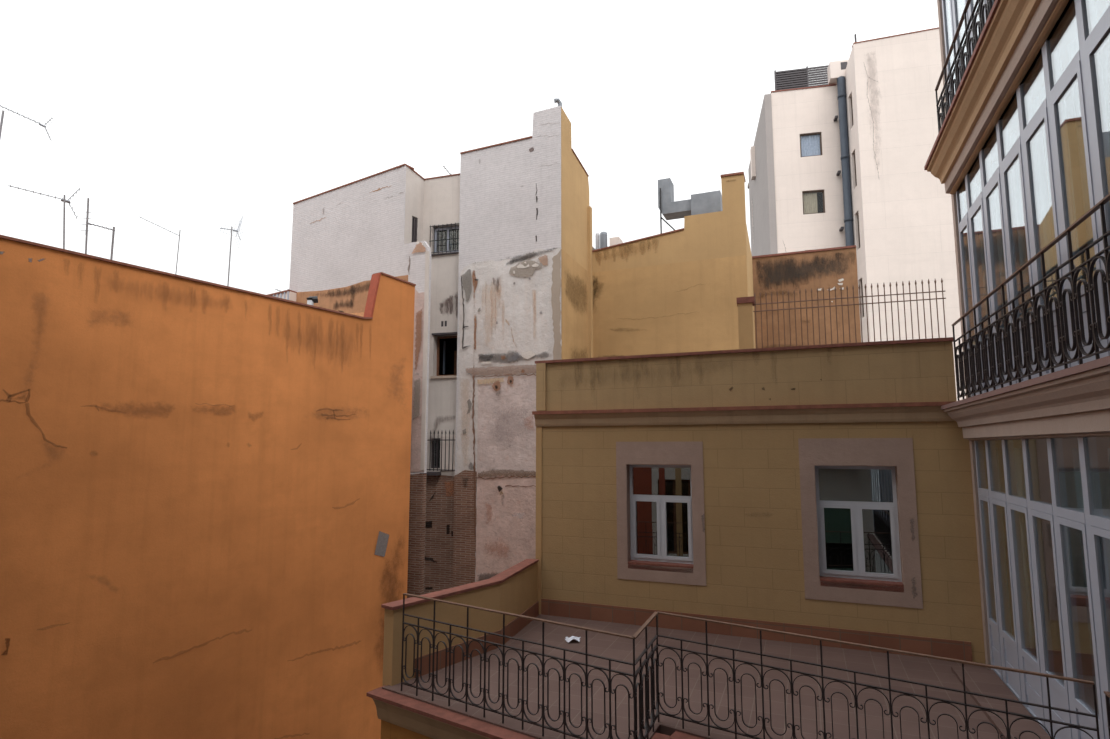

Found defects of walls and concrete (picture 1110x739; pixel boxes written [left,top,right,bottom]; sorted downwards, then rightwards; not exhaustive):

peeling [407,248,562,598]
water stain [762,258,845,302]